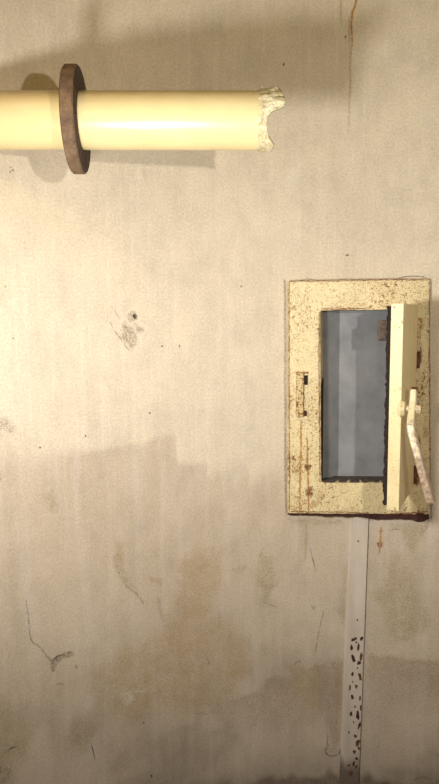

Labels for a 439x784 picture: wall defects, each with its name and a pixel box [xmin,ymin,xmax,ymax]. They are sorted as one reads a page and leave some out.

crack [26,600,77,685]